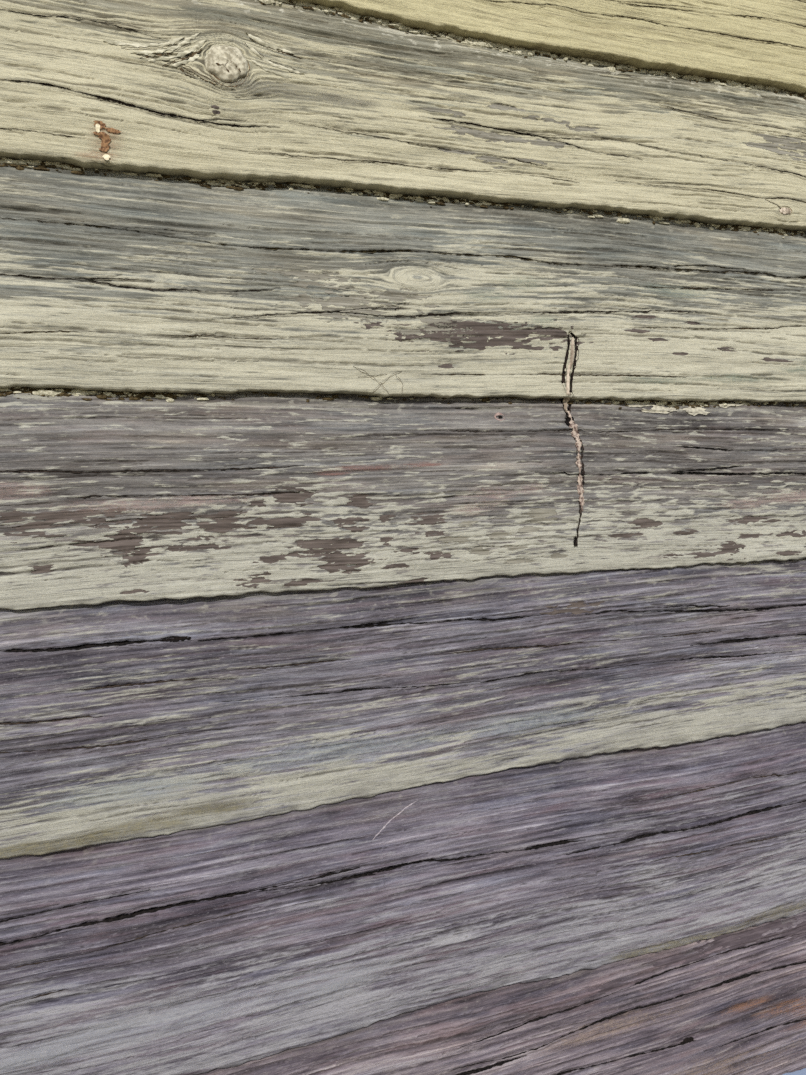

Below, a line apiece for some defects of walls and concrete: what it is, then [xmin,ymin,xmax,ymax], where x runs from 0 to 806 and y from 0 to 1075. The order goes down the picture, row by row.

corrosion [93,120,121,160]
peeling [256,265,593,355]
crack [0,218,806,546]
peeling [0,487,558,588]
peeling [608,518,663,538]
peeling [663,516,806,560]
crack [0,604,806,702]
crack [0,716,102,725]
crack [0,728,225,753]
crack [663,769,806,799]
crack [0,800,806,970]
crack [453,933,806,1075]